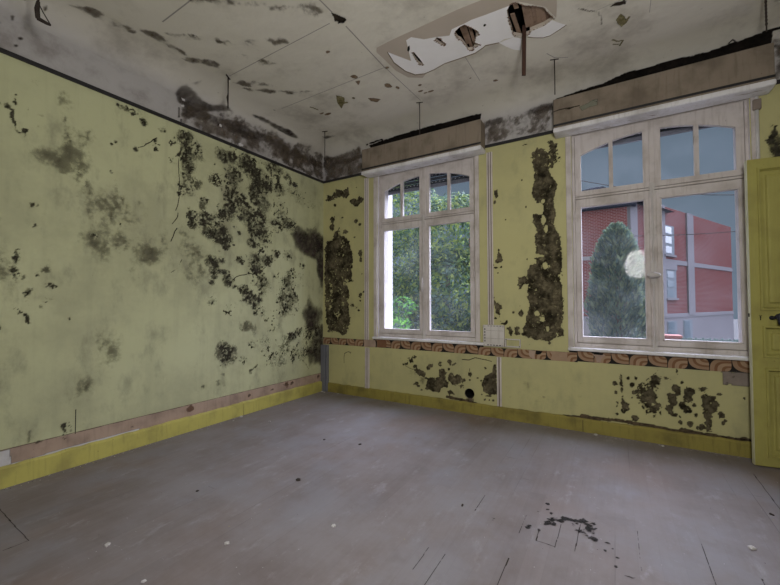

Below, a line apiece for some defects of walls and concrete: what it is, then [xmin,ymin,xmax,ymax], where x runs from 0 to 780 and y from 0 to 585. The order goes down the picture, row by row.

peeling [377,0,566,94]
damp [141,246,158,262]
damp [164,87,383,372]
peeling [324,227,364,335]
peeling [494,140,564,345]
flaking render [0,373,321,467]
peeling [446,364,497,403]
spalling [563,414,752,442]